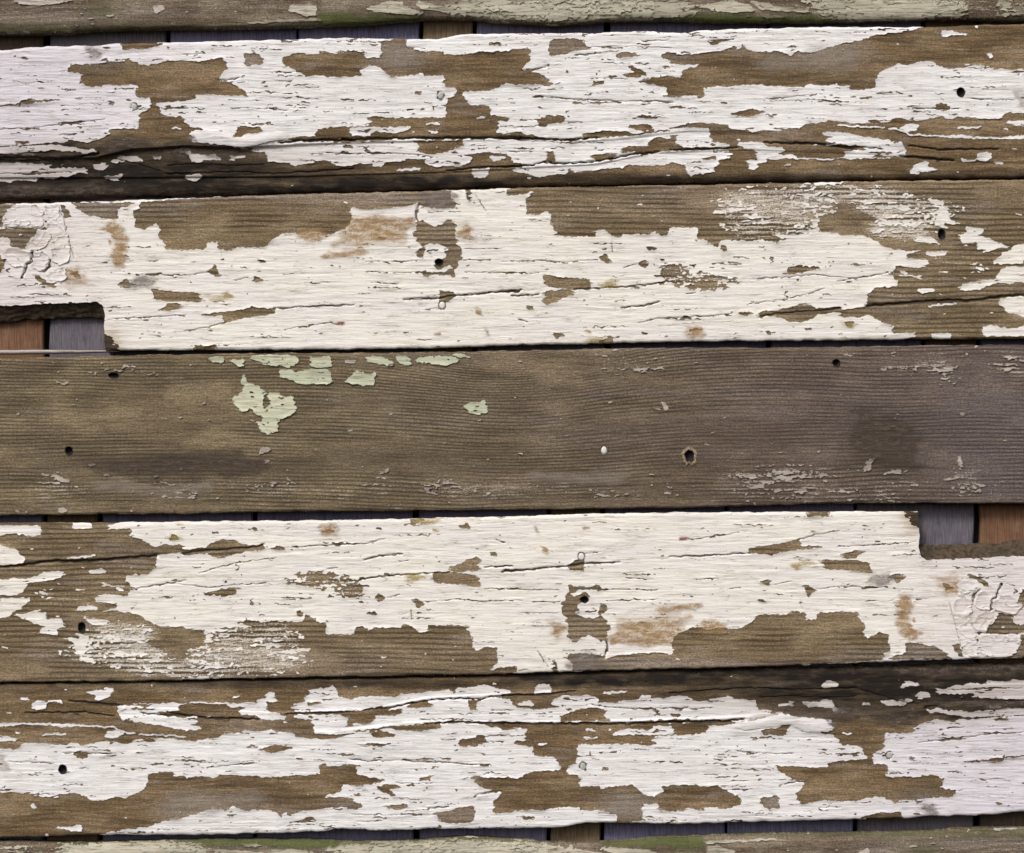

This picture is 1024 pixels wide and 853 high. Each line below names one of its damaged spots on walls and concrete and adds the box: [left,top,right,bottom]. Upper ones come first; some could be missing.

peeling [616,24,1024,99]
peeling [0,38,1024,340]
crack [5,212,74,278]
peeling [104,334,120,351]
crack [135,540,655,619]
crack [670,532,745,580]
peeling [904,511,919,528]
crack [950,585,1018,652]
peeling [0,522,1024,824]
peeling [0,763,408,838]